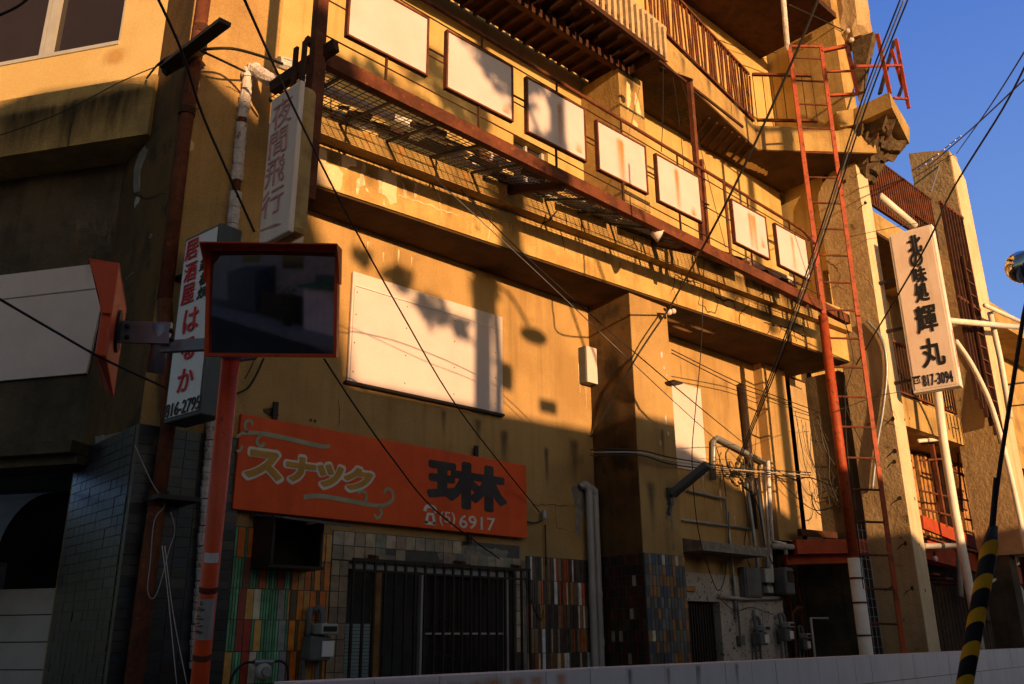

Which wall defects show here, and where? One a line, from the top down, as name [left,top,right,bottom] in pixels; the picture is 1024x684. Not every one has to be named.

peeling [317,148,417,206]